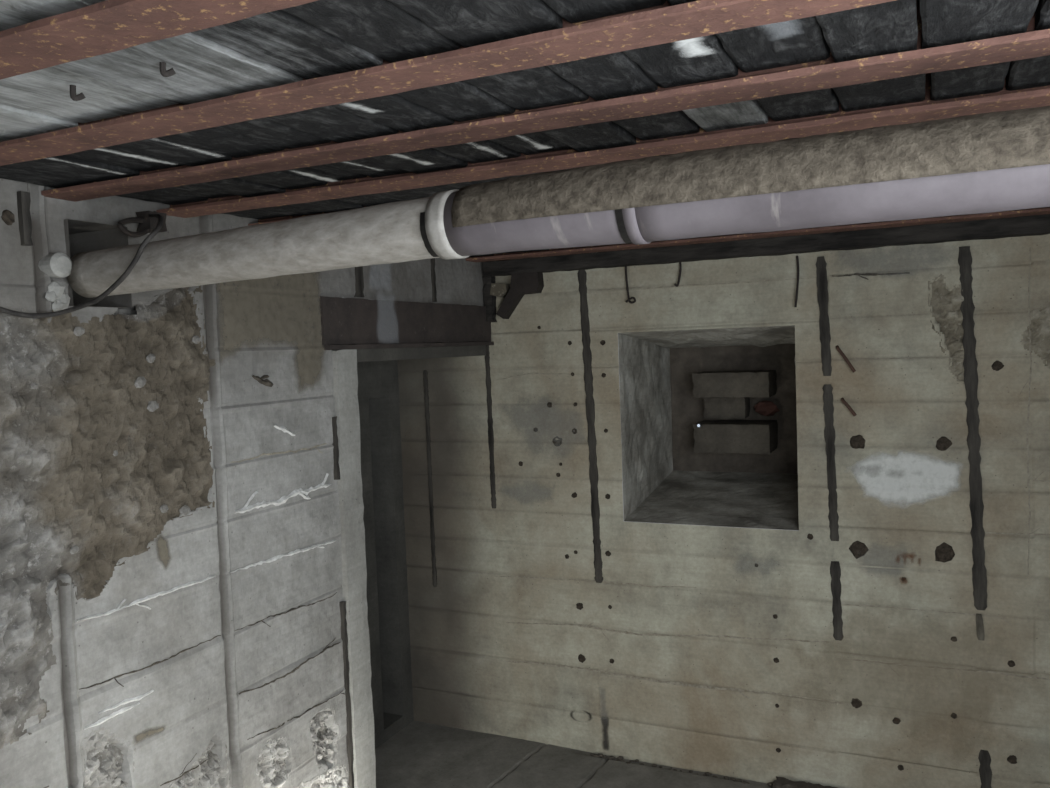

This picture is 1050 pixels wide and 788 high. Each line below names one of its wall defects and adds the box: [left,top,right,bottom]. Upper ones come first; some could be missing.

spalling [928,274,964,384]
spalling [1021,301,1050,369]
spalling [0,272,325,749]
spalling [82,727,164,788]
spalling [166,735,231,788]
spalling [256,706,349,788]